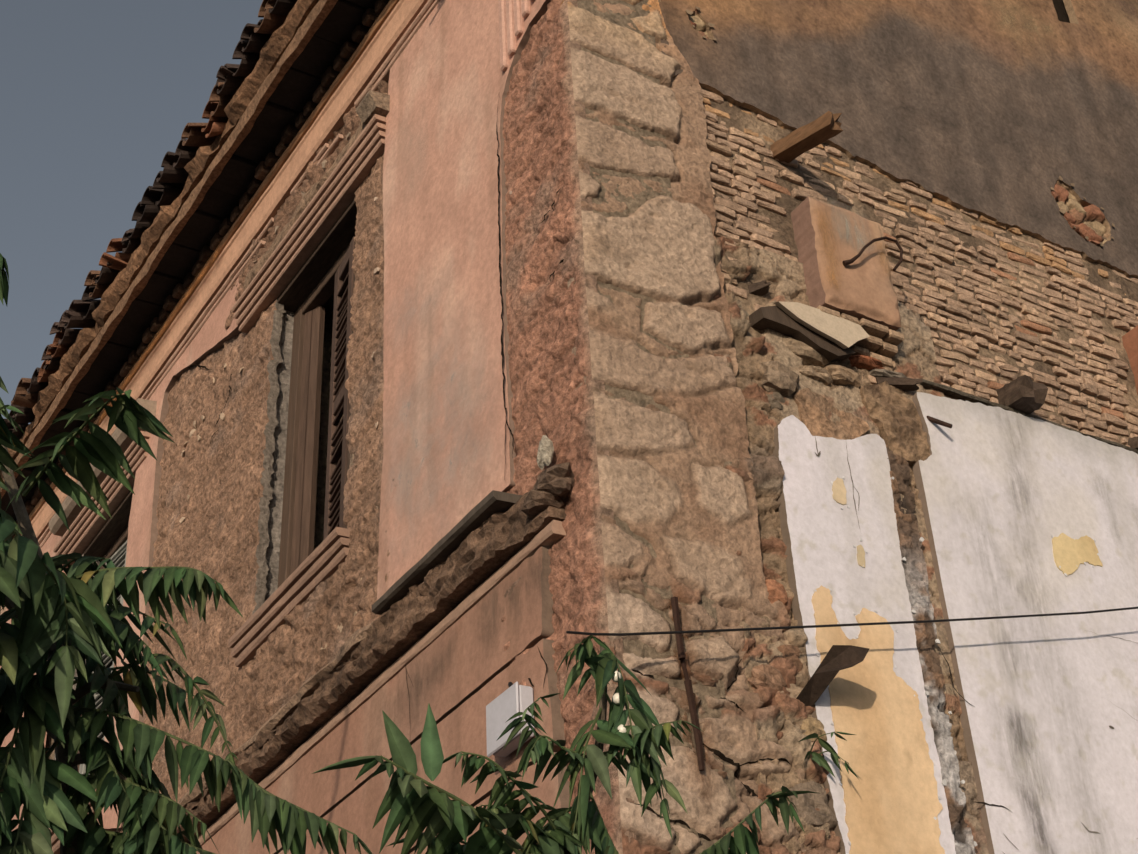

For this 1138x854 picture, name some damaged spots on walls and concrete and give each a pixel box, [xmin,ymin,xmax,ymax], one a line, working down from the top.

flaking render [1051,176,1115,247]
crack [815,437,861,532]
peeling [831,476,850,509]
peeling [853,537,868,568]
peeling [1051,533,1103,576]
crack [886,445,1012,854]
peeling [811,585,945,854]